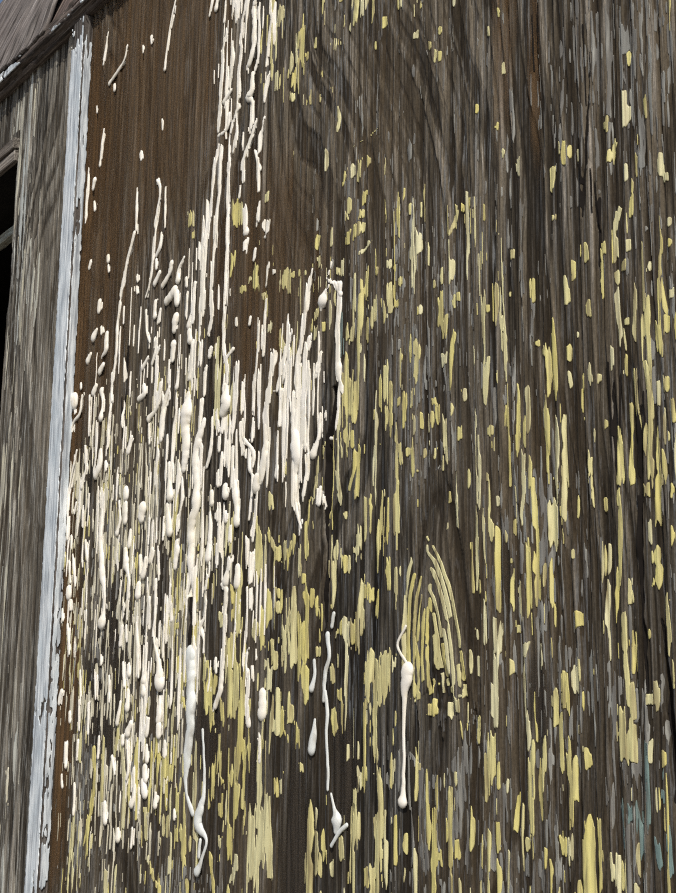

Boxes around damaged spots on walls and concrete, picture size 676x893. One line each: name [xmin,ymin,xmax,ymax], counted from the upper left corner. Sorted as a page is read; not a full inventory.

peeling [4,67,41,393]
peeling [260,0,321,105]
crack [531,3,539,72]
peeling [0,406,22,815]
peeling [24,16,326,893]
crack [324,386,337,635]
peeling [279,0,676,893]
crack [606,361,676,803]